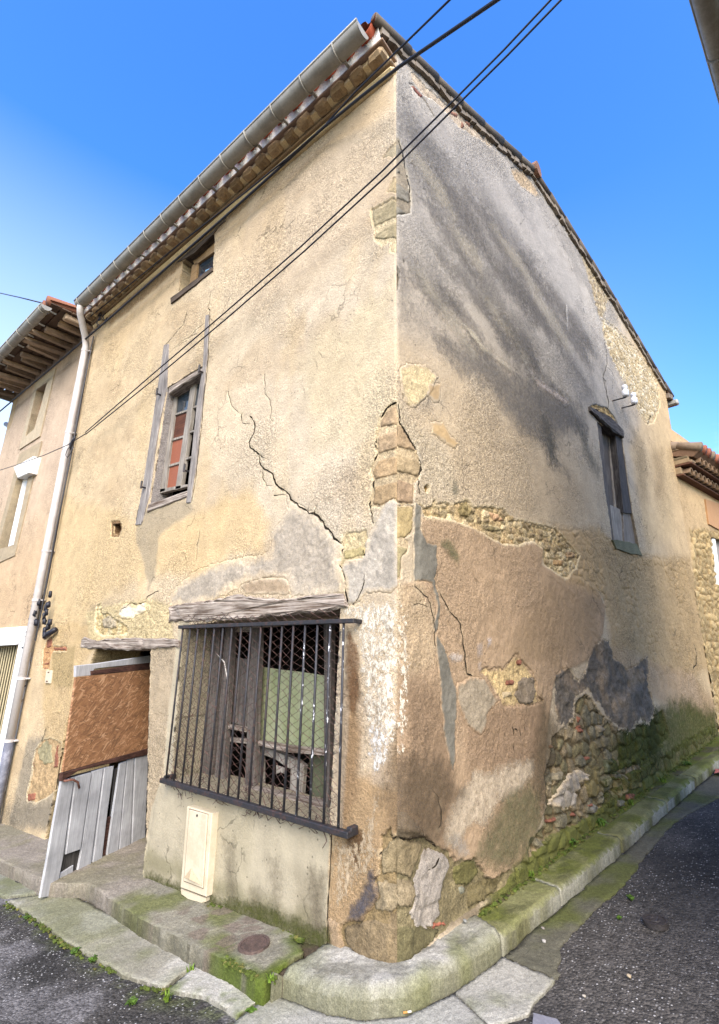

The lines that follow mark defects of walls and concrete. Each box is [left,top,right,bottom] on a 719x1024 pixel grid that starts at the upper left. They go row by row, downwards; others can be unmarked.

crack [165,301,365,604]
spalling [371,404,579,580]
water stain [445,328,585,462]
spalling [560,223,660,424]
crack [414,586,472,676]
spalling [481,654,542,708]
spalling [27,739,62,802]
spalling [527,695,668,857]
spalling [328,797,512,963]